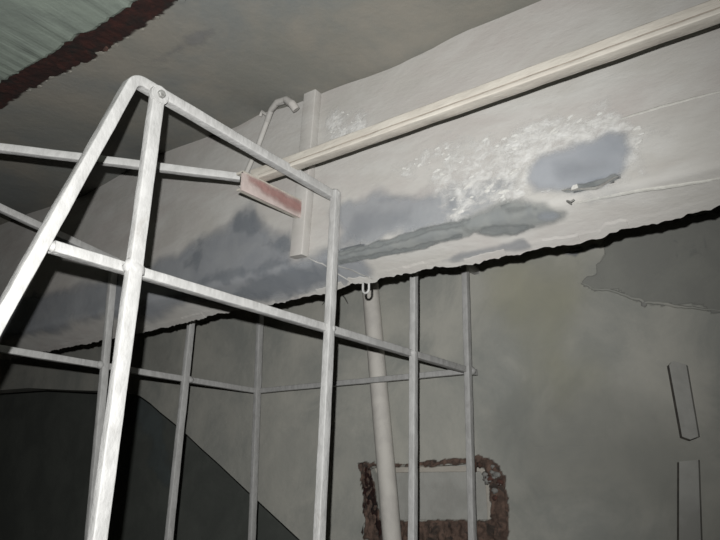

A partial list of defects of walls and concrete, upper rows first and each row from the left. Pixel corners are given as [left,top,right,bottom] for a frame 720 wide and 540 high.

leakage [340,101,645,243]
spalling [562,174,619,192]
leakage [152,213,327,298]
leakage [337,260,368,283]
peeling [337,195,720,313]
leakage [1,279,123,336]
leakage [137,281,201,317]
flaking render [135,305,243,334]
flaking render [256,286,326,305]
flaking render [32,335,103,352]